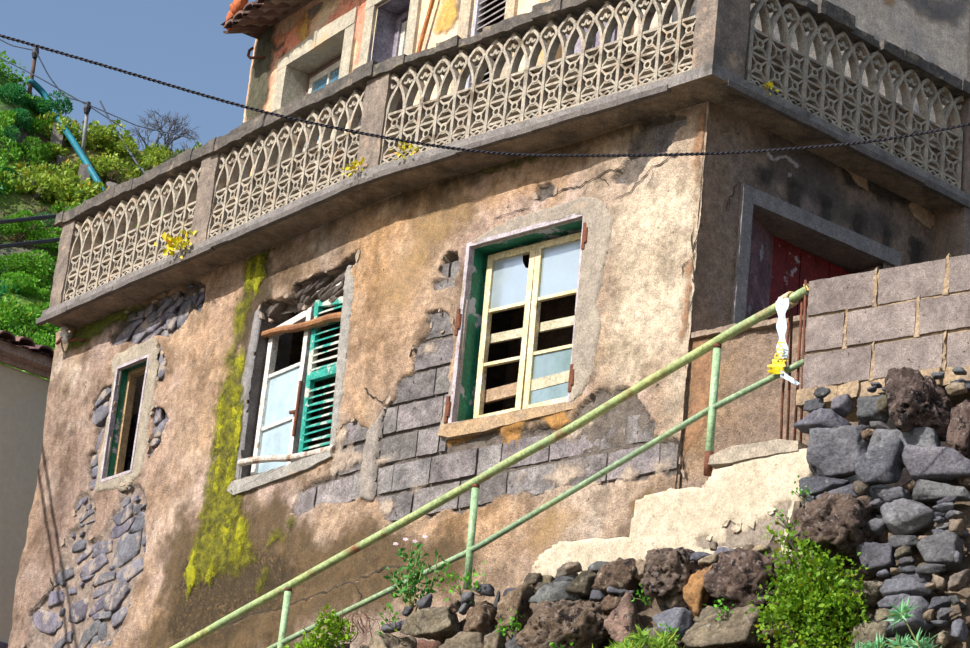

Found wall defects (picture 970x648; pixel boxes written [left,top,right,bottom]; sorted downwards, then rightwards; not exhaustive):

water stain [909,0,969,24]
crack [493,150,684,220]
spalling [114,284,206,383]
water stain [241,257,284,378]
spalling [257,249,361,325]
spalling [433,256,460,291]
spalling [147,404,169,458]
spalling [293,418,368,516]
spalling [376,308,687,521]
spalling [32,384,147,648]
flaking render [696,501,793,549]